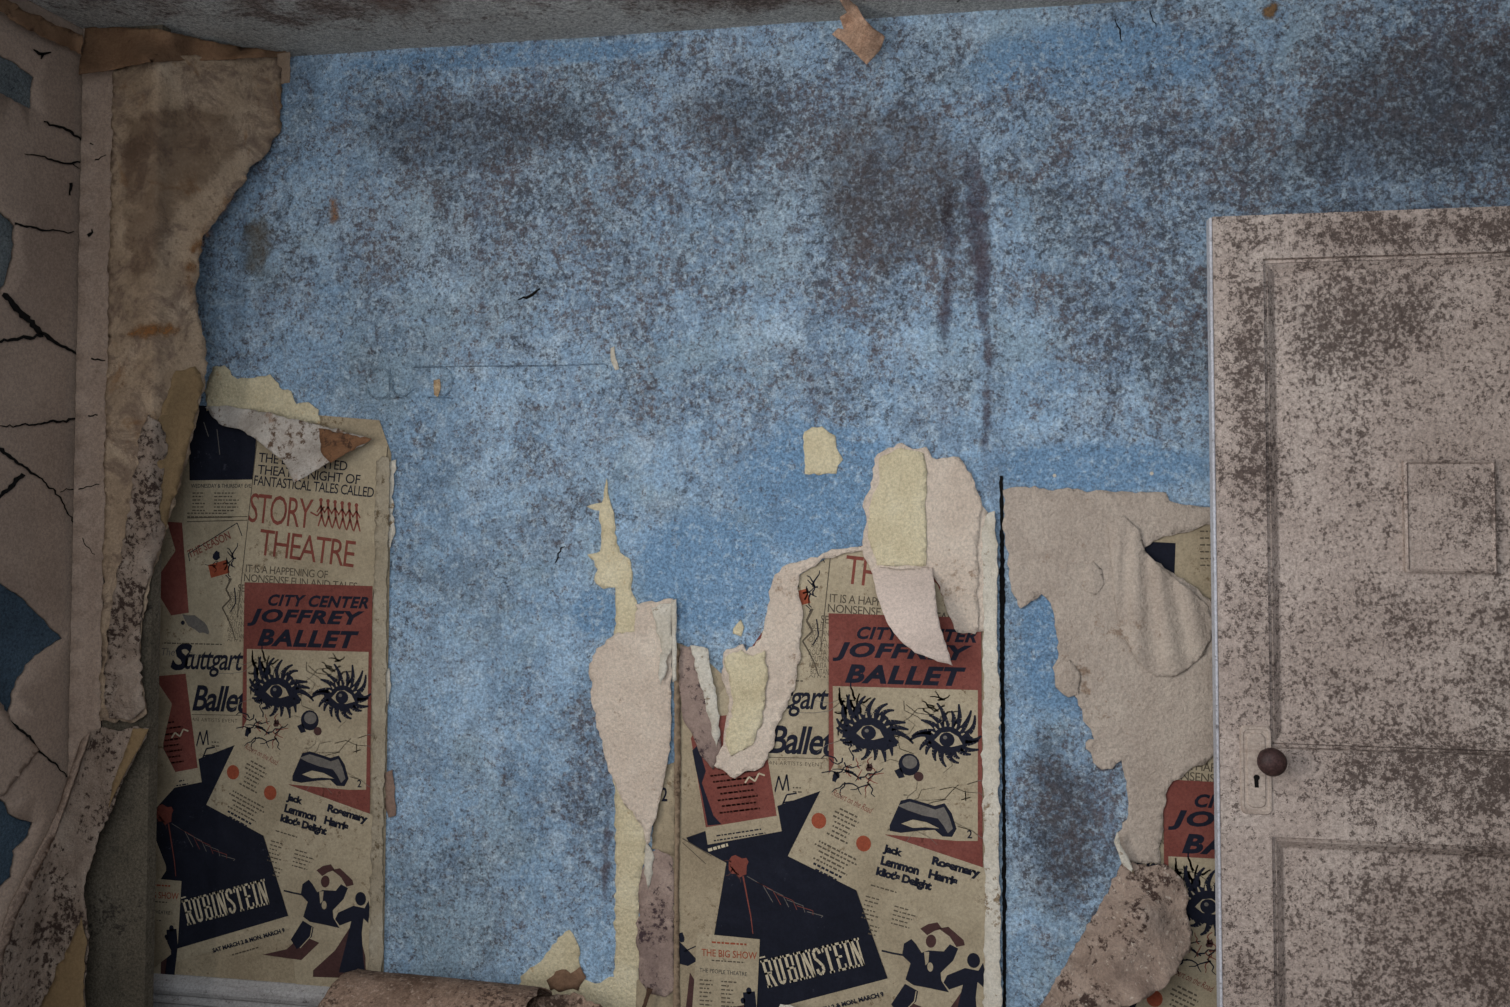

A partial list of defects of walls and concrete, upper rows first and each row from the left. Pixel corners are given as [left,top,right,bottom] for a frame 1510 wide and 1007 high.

peeling [0,0,291,84]
peeling [832,0,885,64]
crack [25,121,106,195]
crack [14,222,93,237]
damp [938,145,991,365]
crack [0,293,105,361]
damp [981,390,990,445]
crack [0,414,106,603]
spalling [103,415,168,720]
spalling [0,584,61,885]